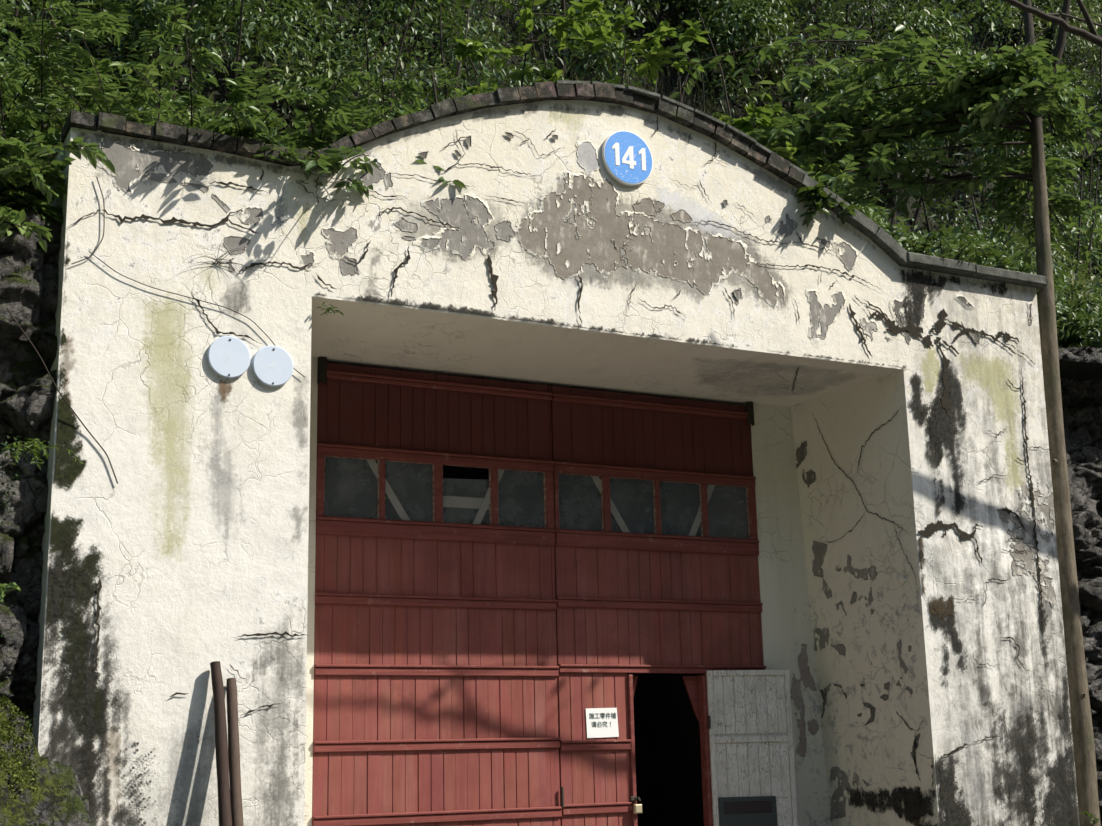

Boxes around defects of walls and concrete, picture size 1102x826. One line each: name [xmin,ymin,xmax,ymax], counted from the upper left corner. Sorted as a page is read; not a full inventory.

crack [69,169,268,233]
flaking render [322,226,360,276]
crack [238,129,560,296]
crack [486,255,499,310]
flaking render [393,137,785,309]
flaking render [765,213,799,242]
flaking render [805,289,846,339]
water stain [54,328,87,489]
crack [674,133,1049,668]
water stain [39,513,156,826]
water stain [847,754,978,826]
water stain [982,658,1080,826]